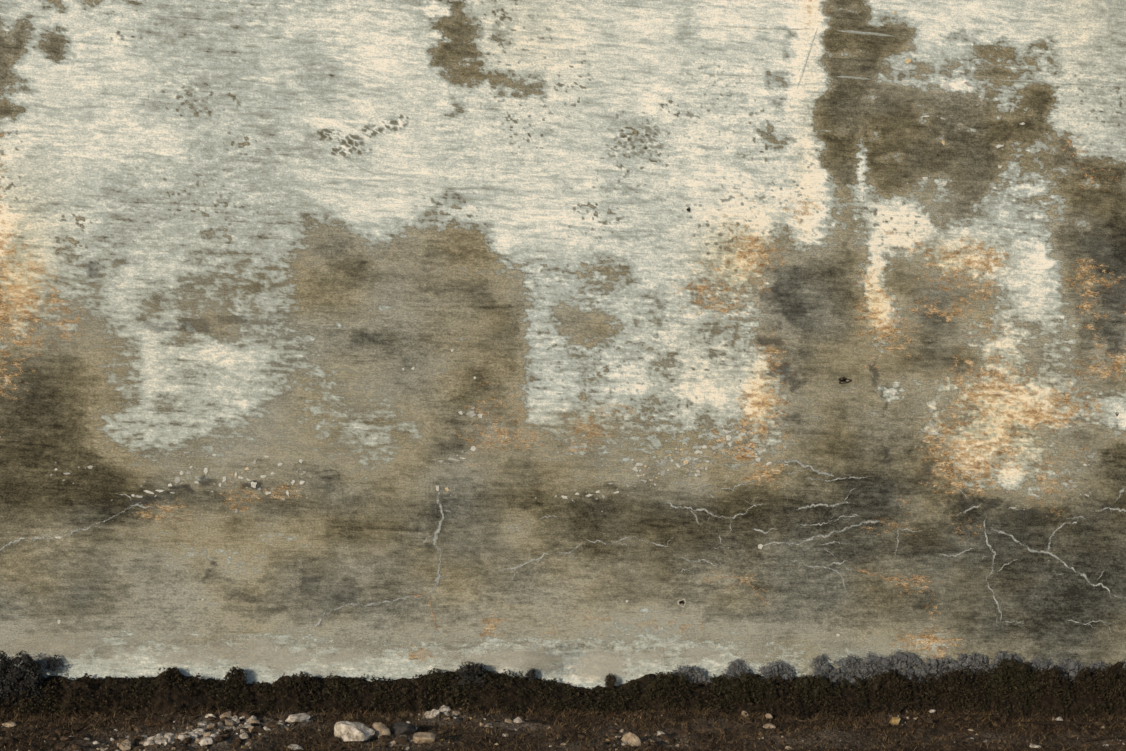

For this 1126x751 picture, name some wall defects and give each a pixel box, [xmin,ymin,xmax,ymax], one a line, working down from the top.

corrosion [921,259,1126,498]
leakage [129,475,211,507]
crack [305,492,450,631]
crack [496,459,929,607]
crack [941,488,1126,632]
efflorescence [16,642,111,661]
efflorescence [445,643,561,672]
efflorescence [573,647,663,680]